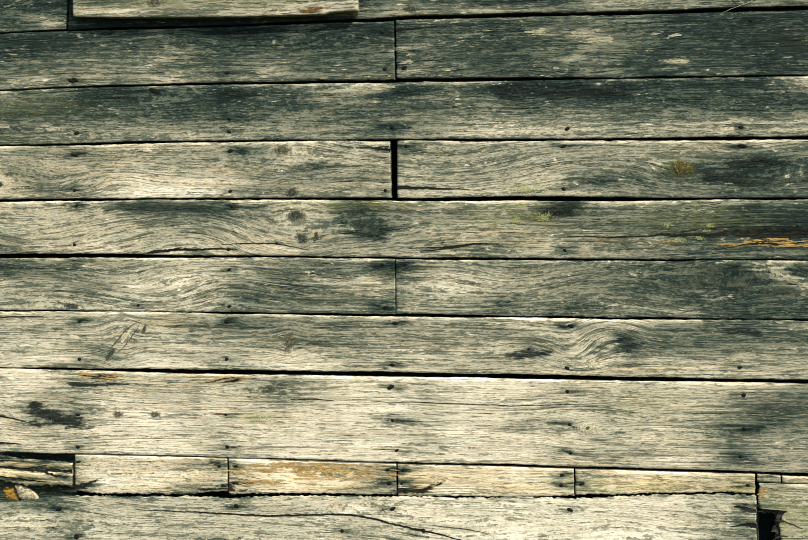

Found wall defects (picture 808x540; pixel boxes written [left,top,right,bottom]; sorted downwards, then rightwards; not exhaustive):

rust [717,238,808,247]
leakage [27,401,94,430]
rust [4,487,19,500]
crack [137,509,485,540]